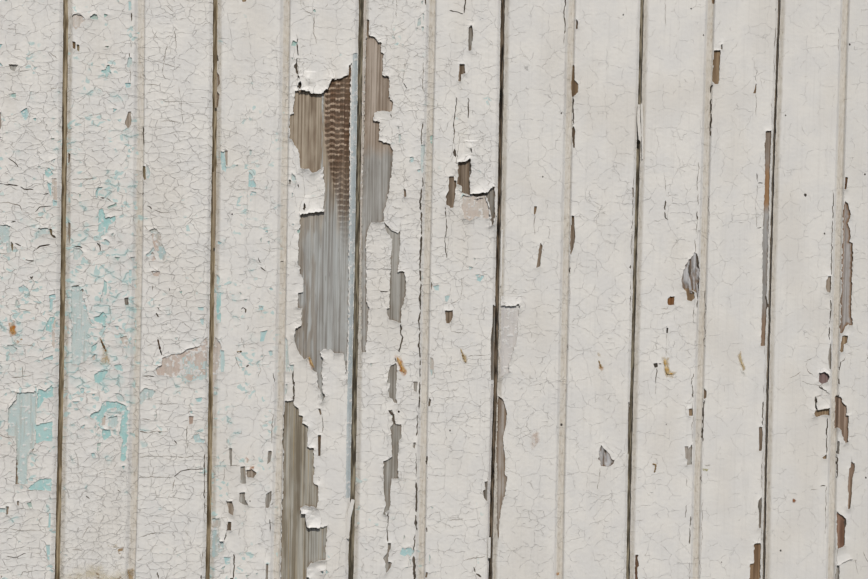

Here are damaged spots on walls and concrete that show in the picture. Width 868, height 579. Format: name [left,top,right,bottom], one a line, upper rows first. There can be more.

crack [294,39,302,91]
crack [707,85,715,136]
crack [0,158,51,218]
peeling [265,0,414,579]
crack [415,178,423,435]
peeling [444,98,522,579]
spalling [681,240,700,305]
crack [691,374,705,441]
peeling [755,131,771,352]
peeling [791,202,856,579]
peeling [210,448,256,579]
crack [411,463,419,579]